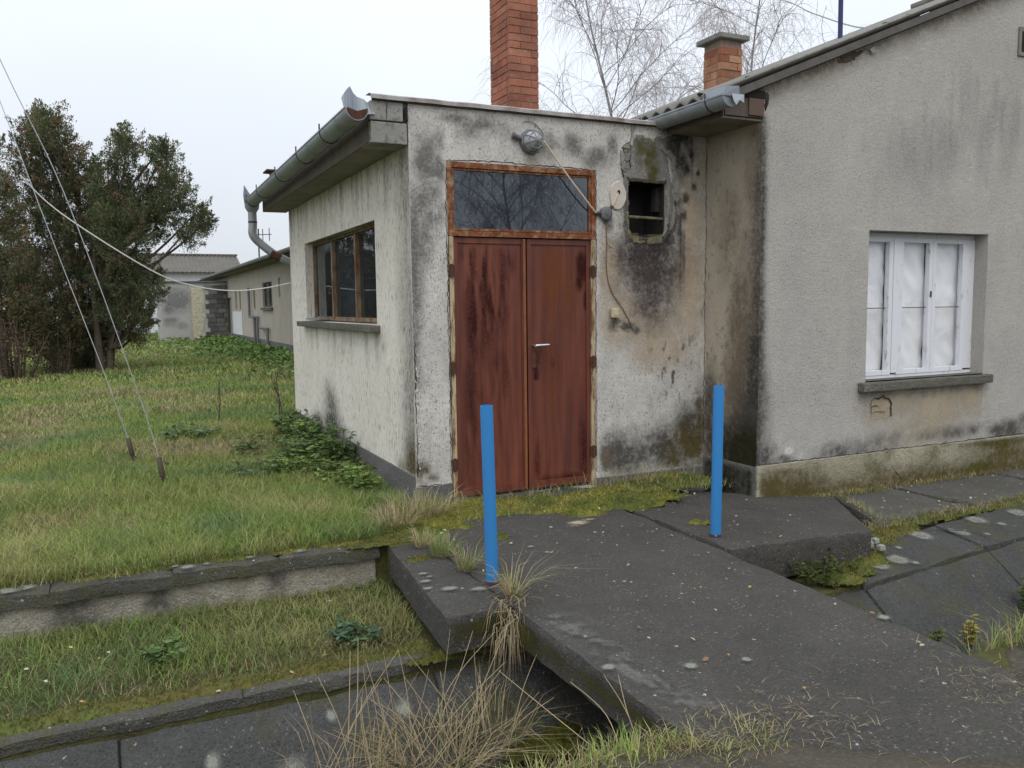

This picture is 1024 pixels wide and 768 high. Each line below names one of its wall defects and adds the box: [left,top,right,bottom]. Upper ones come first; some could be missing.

rust [468,252,504,352]
rust [577,254,586,308]
water stain [600,118,802,474]
spalling [870,394,892,420]
water stain [991,416,1024,437]